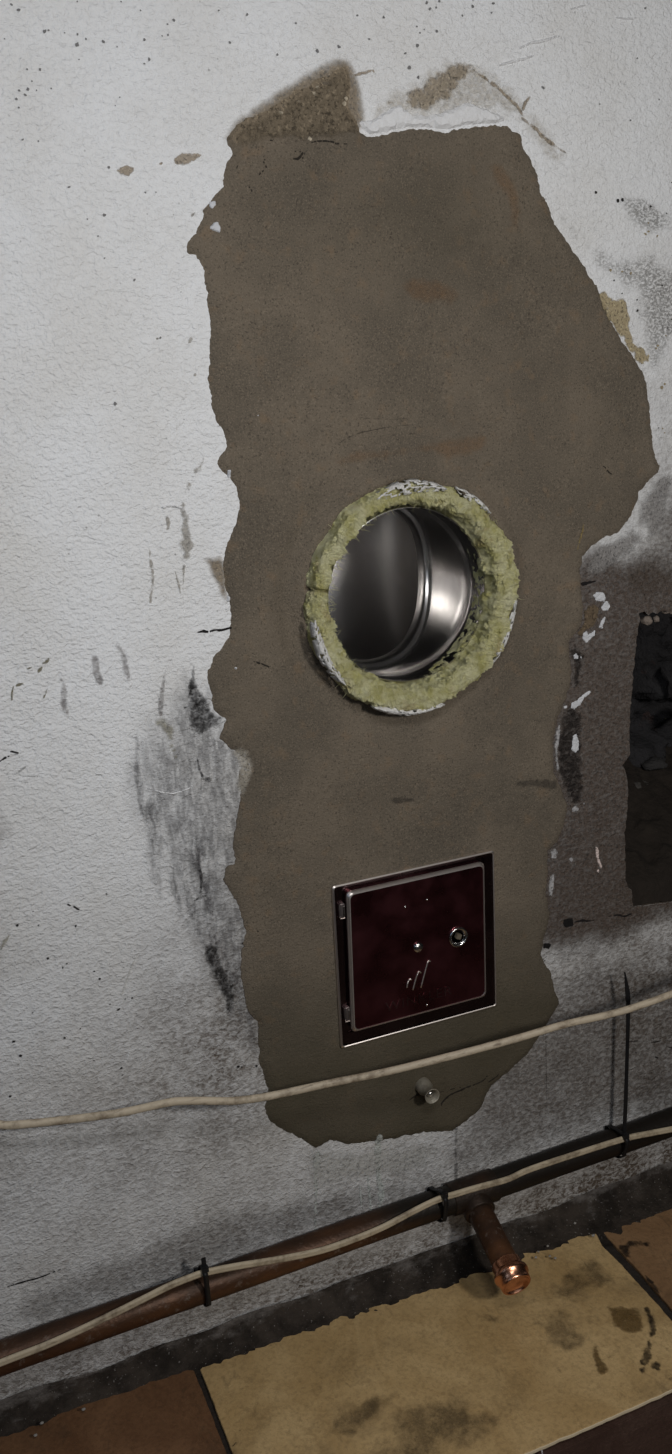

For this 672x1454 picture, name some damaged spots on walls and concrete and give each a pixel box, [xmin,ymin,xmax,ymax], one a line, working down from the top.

peeling [358,26,565,152]
peeling [191,201,221,232]
peeling [600,269,672,364]
peeling [573,592,610,659]
leakage [184,680,218,732]
peeling [555,691,591,770]
spalling [628,611,672,767]
peeling [549,849,573,896]
leakage [206,947,233,1010]